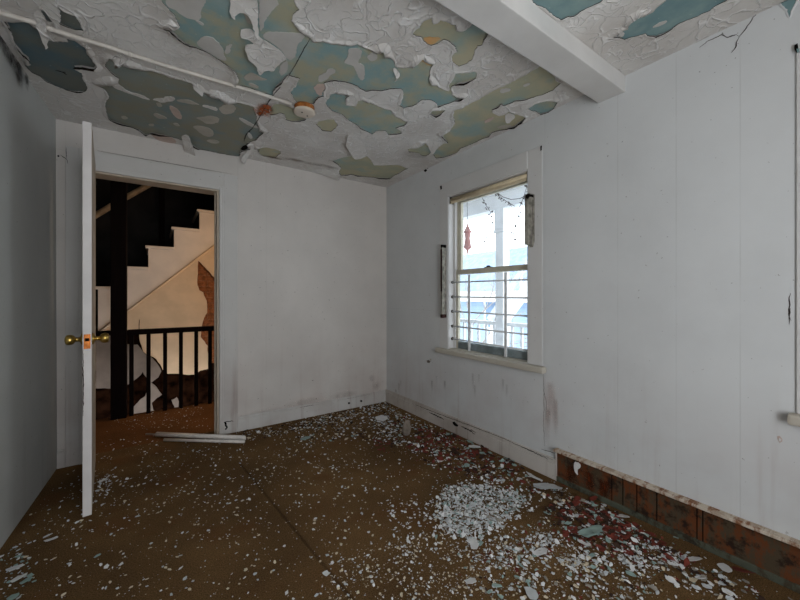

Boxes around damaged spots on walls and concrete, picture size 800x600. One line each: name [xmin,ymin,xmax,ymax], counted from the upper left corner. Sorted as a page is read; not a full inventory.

peeling [529,0,605,22]
peeling [606,0,730,41]
crack [699,15,756,53]
peeling [776,0,799,19]
peeling [0,0,563,180]
flaking render [127,248,214,414]
flaking render [96,326,110,389]